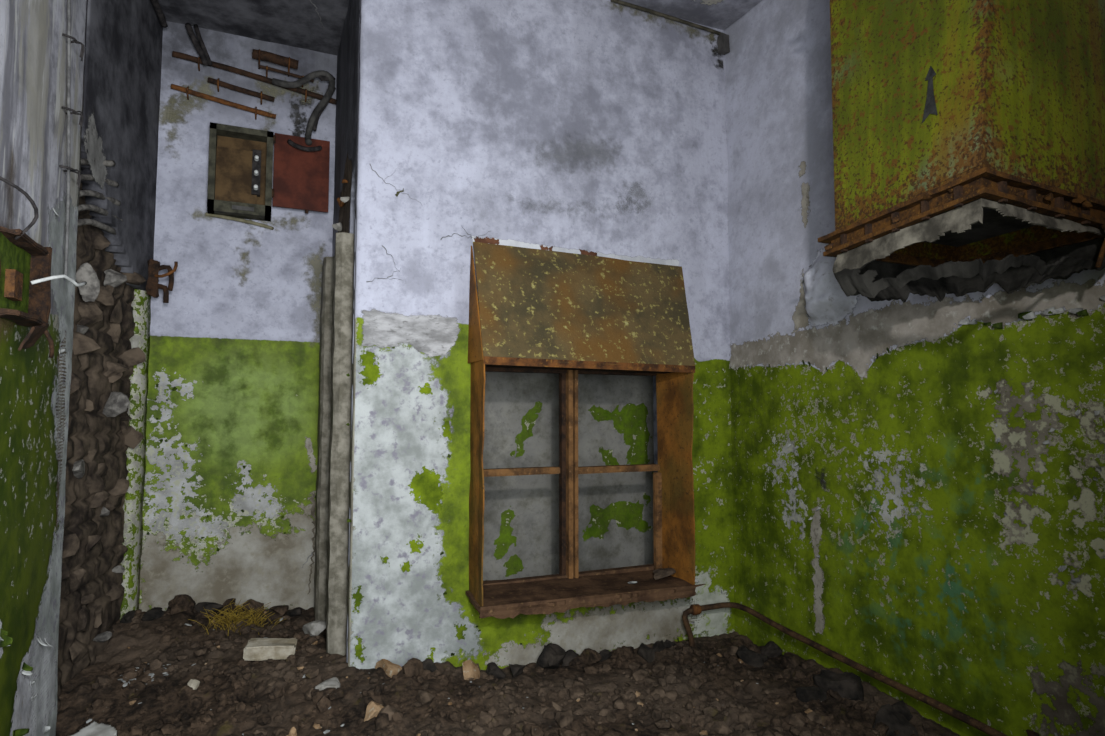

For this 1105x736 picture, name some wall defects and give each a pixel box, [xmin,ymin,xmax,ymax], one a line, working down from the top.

peeling [10,112,317,736]
peeling [346,343,731,669]
peeling [764,431,826,634]
peeling [856,443,933,547]
flaking render [729,273,1105,378]
peeling [975,377,1105,611]
peeling [0,620,13,658]